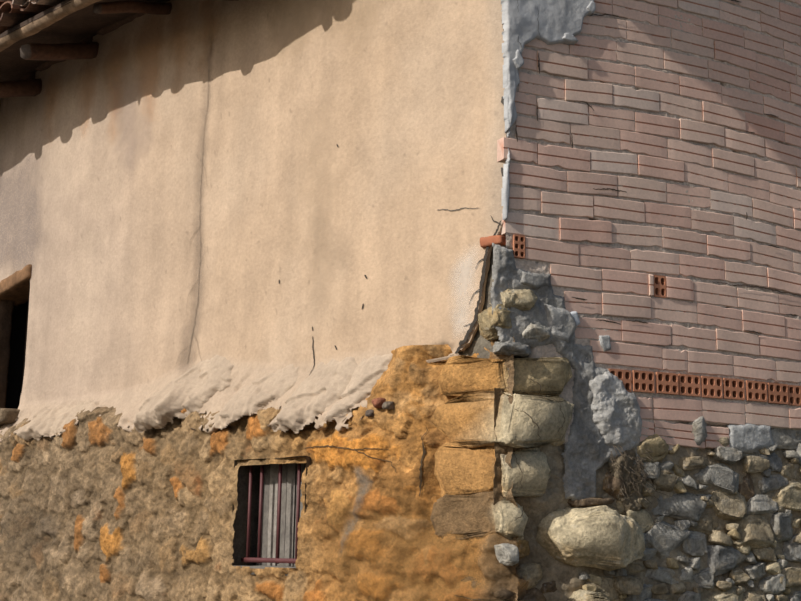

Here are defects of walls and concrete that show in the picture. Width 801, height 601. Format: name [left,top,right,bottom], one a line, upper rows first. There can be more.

flaking render [501,0,596,138]
spalling [455,148,510,359]
spalling [365,397,394,417]
crack [508,379,565,439]
crack [305,445,396,472]